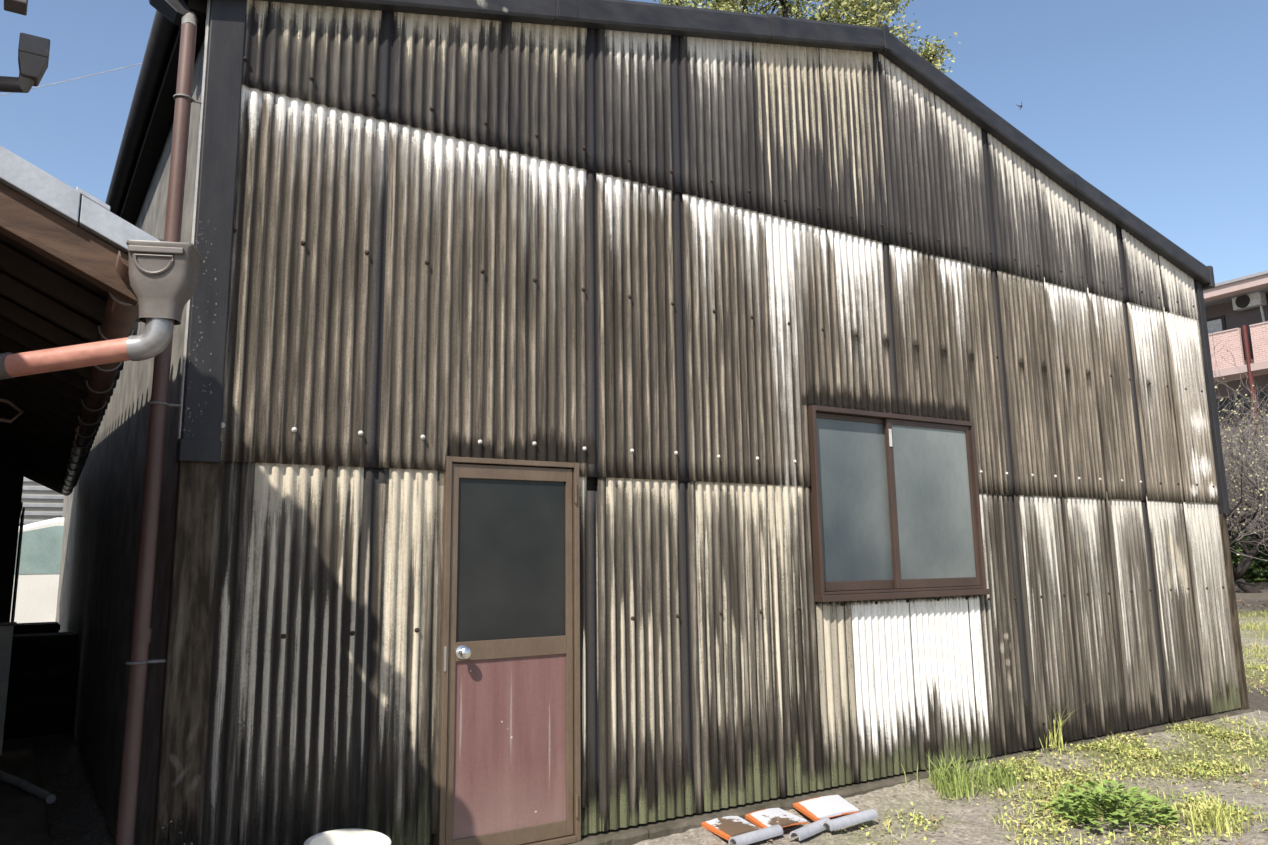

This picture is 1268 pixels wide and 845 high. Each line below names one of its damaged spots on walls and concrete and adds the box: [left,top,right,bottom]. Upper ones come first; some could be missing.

water stain [247,0,587,74]
water stain [605,30,671,73]
water stain [240,37,1203,389]
water stain [801,385,970,421]
water stain [448,430,597,507]
water stain [606,478,678,538]
water stain [157,463,438,845]
water stain [695,481,1242,808]
water stain [585,563,695,830]